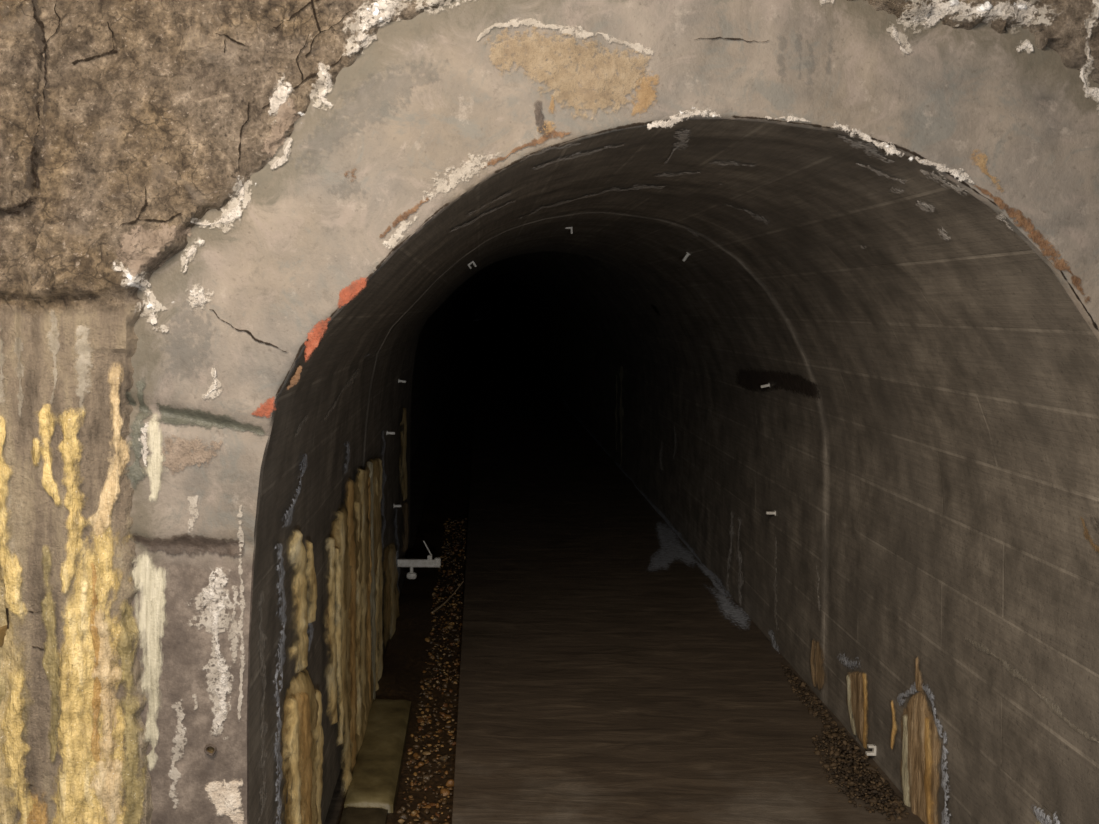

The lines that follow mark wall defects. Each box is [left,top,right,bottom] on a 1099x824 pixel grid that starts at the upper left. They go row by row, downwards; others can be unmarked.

crack [238,0,352,169]
spalling [261,98,300,157]
crack [733,115,997,206]
spalling [116,222,191,276]
corrosion [380,198,429,238]
water stain [113,262,168,333]
crack [209,203,449,397]
corrosion [338,278,367,308]
corrosion [287,318,330,390]
spalling [161,435,222,473]
water stain [0,363,409,824]
water stain [891,657,951,824]